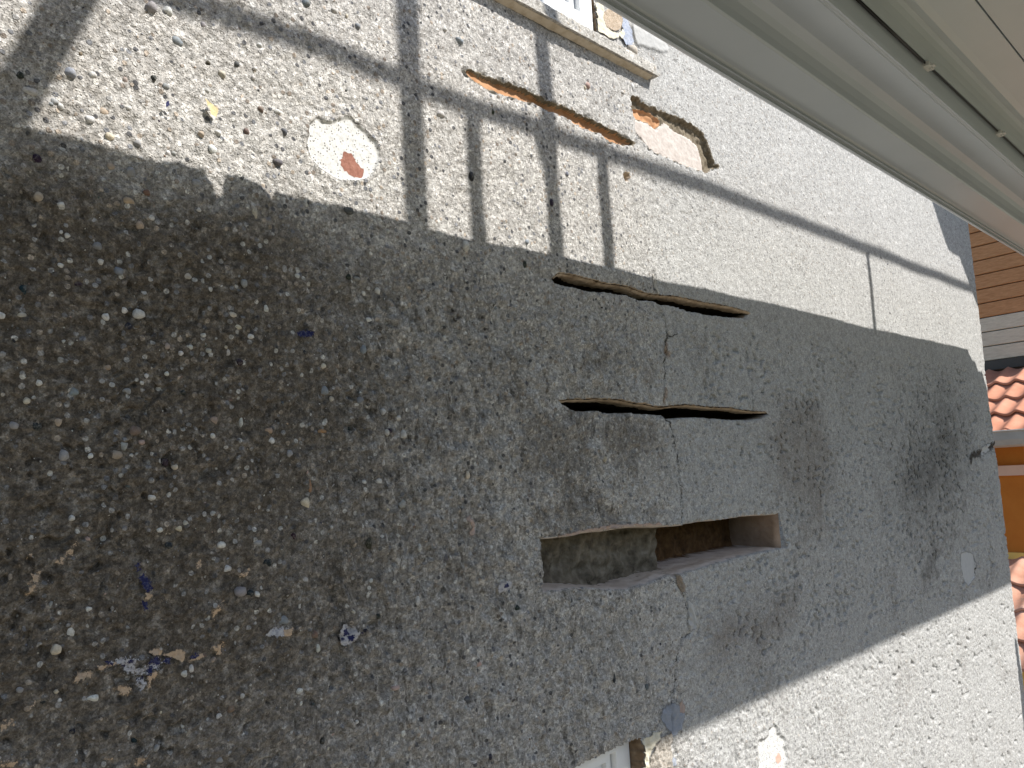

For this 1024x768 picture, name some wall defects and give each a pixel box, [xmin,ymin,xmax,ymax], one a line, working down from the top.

peeling [595,3,634,45]
spalling [630,95,720,173]
spalling [642,731,677,768]